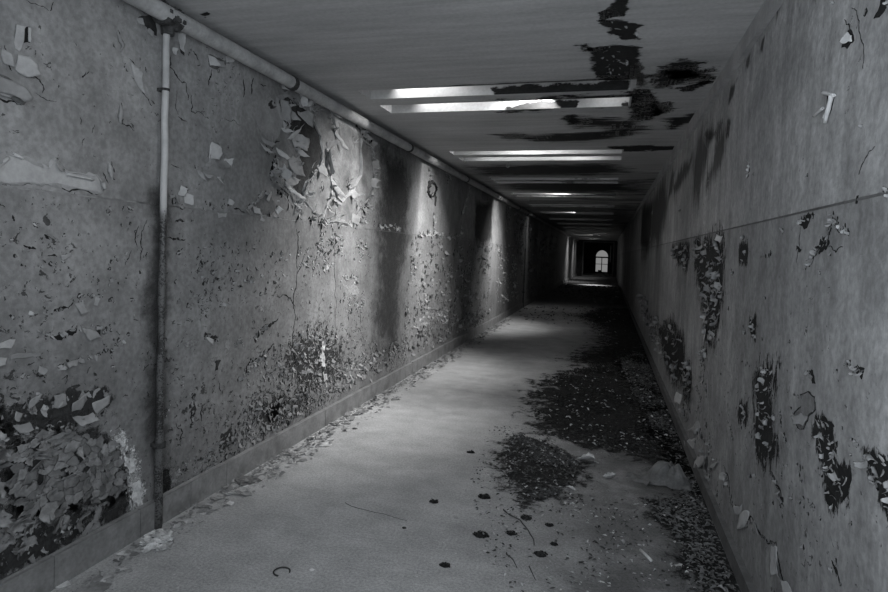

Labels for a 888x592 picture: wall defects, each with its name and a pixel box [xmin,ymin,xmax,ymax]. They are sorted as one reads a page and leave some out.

peeling [0,24,54,105]
peeling [0,151,115,195]
peeling [796,211,850,275]
peeling [163,85,519,492]
peeling [647,220,749,506]
peeling [742,312,763,343]
peeling [726,354,888,528]